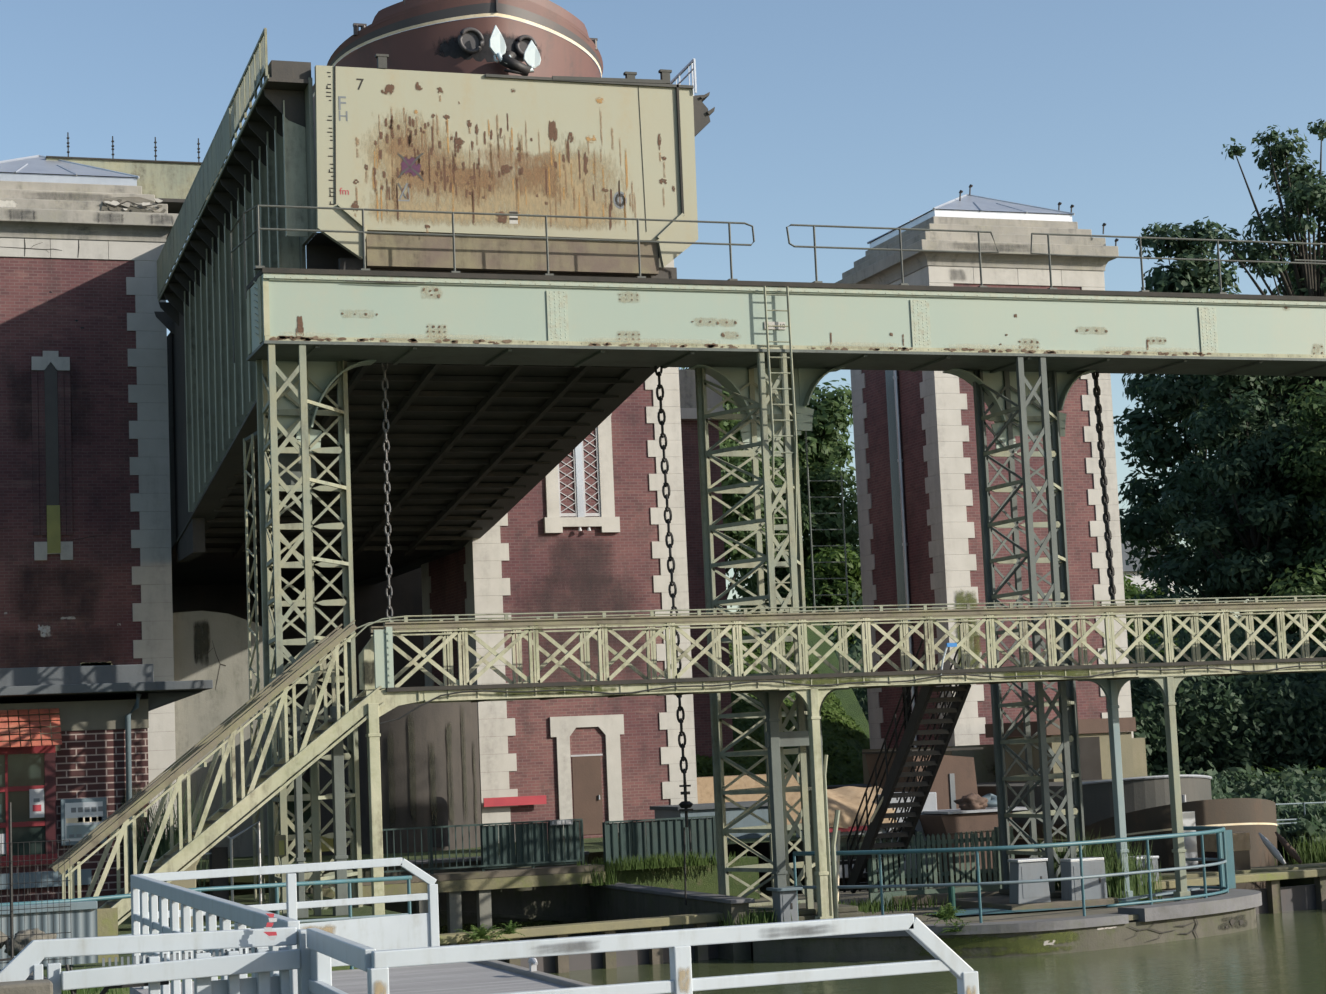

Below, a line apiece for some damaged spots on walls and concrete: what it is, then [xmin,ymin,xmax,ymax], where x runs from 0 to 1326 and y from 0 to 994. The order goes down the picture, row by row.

corrosion [351,82,636,233]